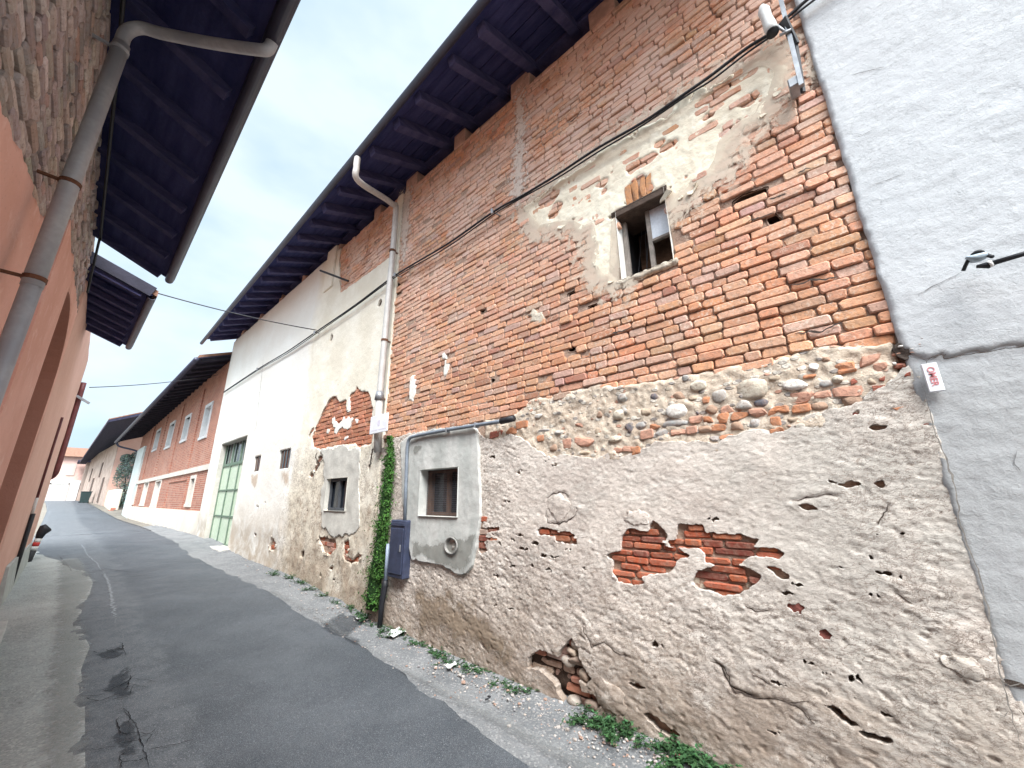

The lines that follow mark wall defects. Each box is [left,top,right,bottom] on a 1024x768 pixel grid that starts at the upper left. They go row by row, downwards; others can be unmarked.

flaking render [512,34,814,313]
crack [904,346,1024,364]
flaking render [327,397,359,441]
flaking render [485,338,923,466]
flaking render [316,536,363,580]
flaking render [478,516,577,572]
flaking render [611,517,784,596]
spalling [532,639,601,712]
crack [711,661,842,724]